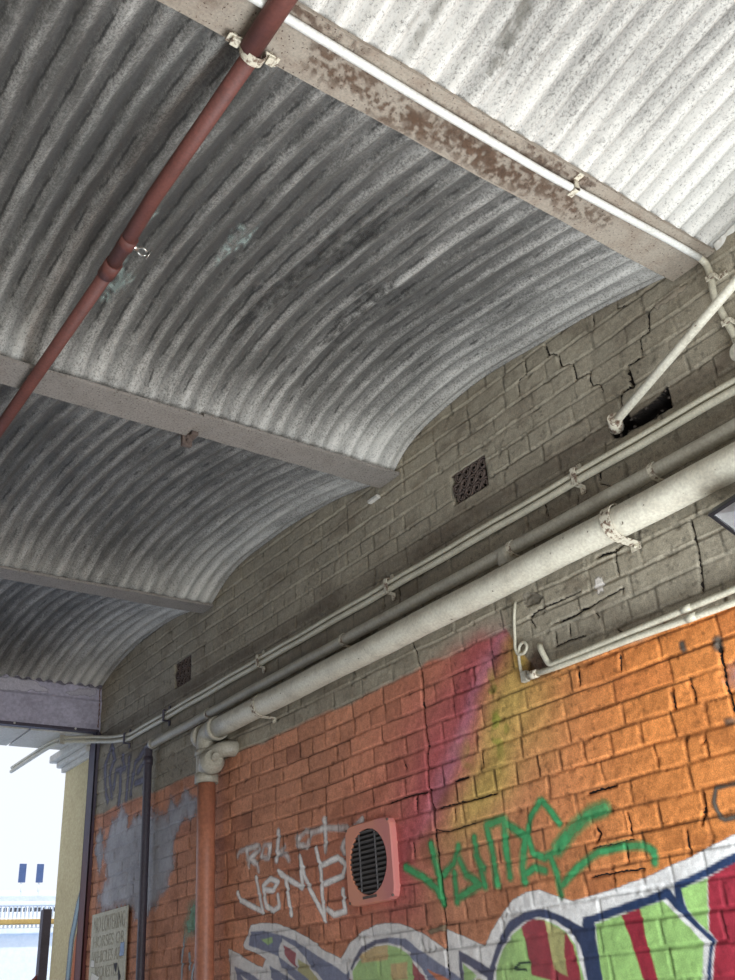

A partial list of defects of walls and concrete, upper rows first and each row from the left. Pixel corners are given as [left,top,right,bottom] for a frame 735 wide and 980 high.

corrosion [293,4,328,29]
corrosion [310,45,608,221]
crack [546,307,654,406]
spalling [613,387,673,438]
crack [692,522,704,592]
crack [532,545,625,671]
crack [719,646,735,712]
crack [392,697,498,975]